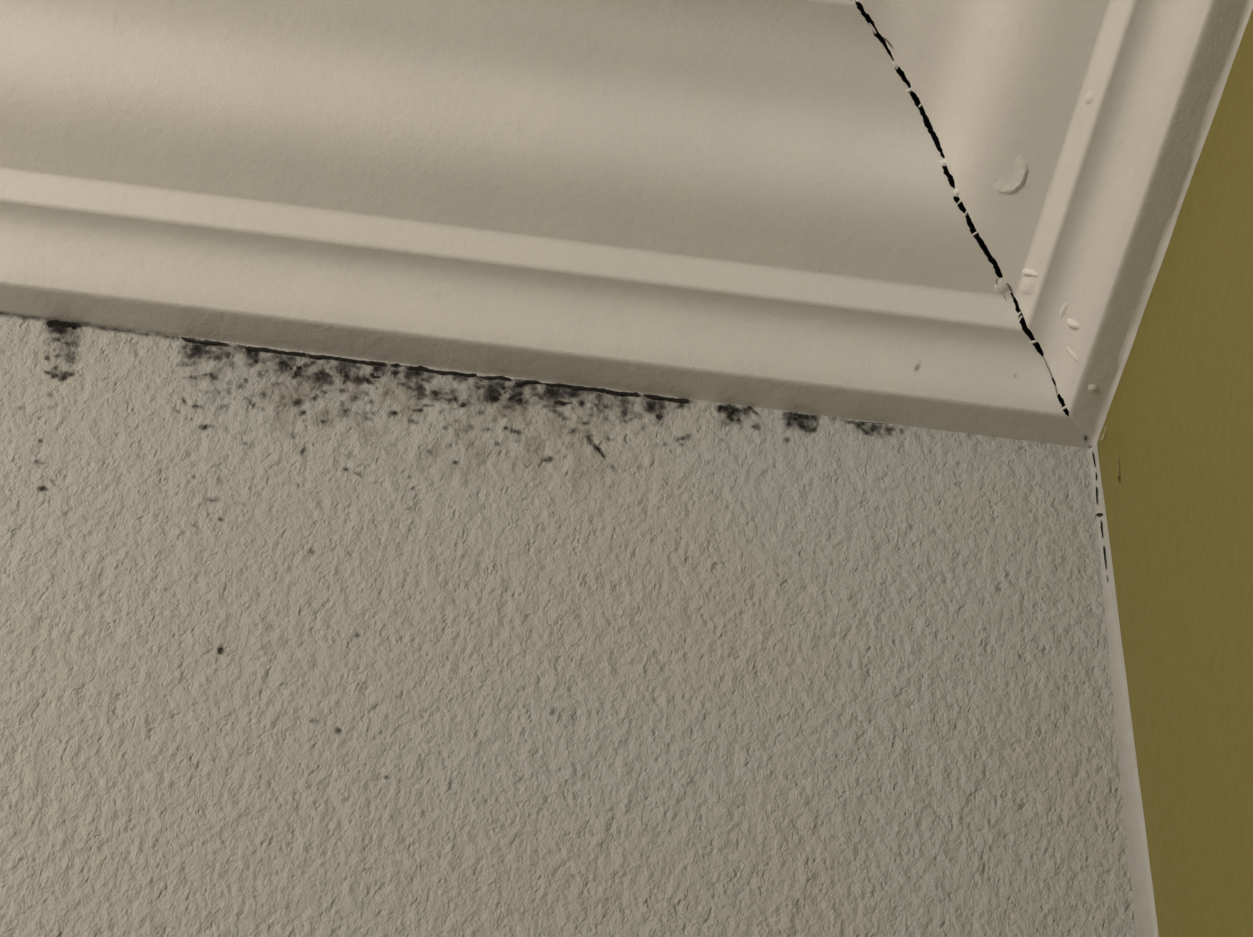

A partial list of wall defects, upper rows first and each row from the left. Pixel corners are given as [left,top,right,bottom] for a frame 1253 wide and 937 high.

crack [855,0,1069,416]
leakage [48,320,77,345]
leakage [183,337,686,434]
crack [180,337,722,405]
leakage [718,404,759,428]
leakage [785,412,817,431]